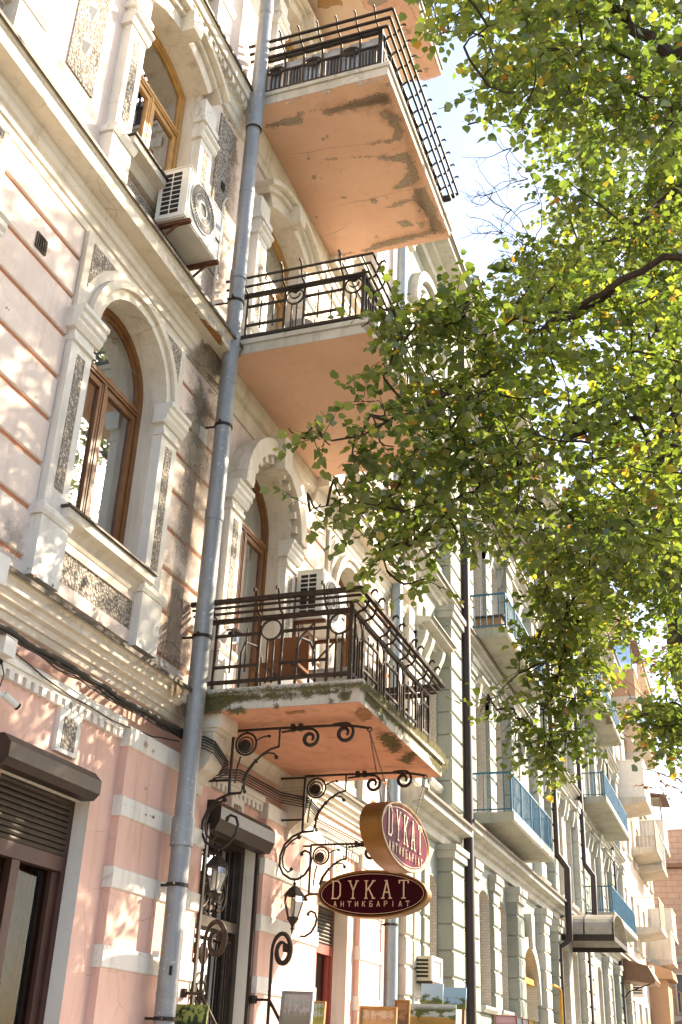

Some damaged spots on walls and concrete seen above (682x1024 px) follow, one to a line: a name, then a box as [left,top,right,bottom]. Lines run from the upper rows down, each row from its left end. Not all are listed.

peeling [267,83,444,256]
leakage [179,375,220,558]
leakage [172,577,183,602]
leakage [204,681,449,774]